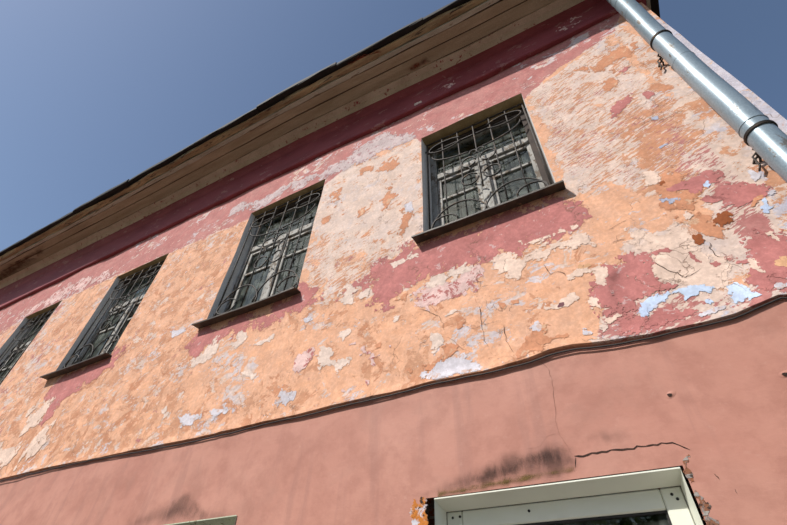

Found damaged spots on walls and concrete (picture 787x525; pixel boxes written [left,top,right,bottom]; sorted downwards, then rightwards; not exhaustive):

peeling [572,41,639,91]
peeling [610,91,654,119]
peeling [334,194,597,322]
peeling [544,166,787,336]
peeling [184,281,324,368]
peeling [292,328,391,374]
peeling [406,332,480,379]
peeling [515,321,569,359]
peeling [161,406,228,428]
peeling [272,388,296,407]
crack [526,361,690,468]
flaking render [409,497,429,525]